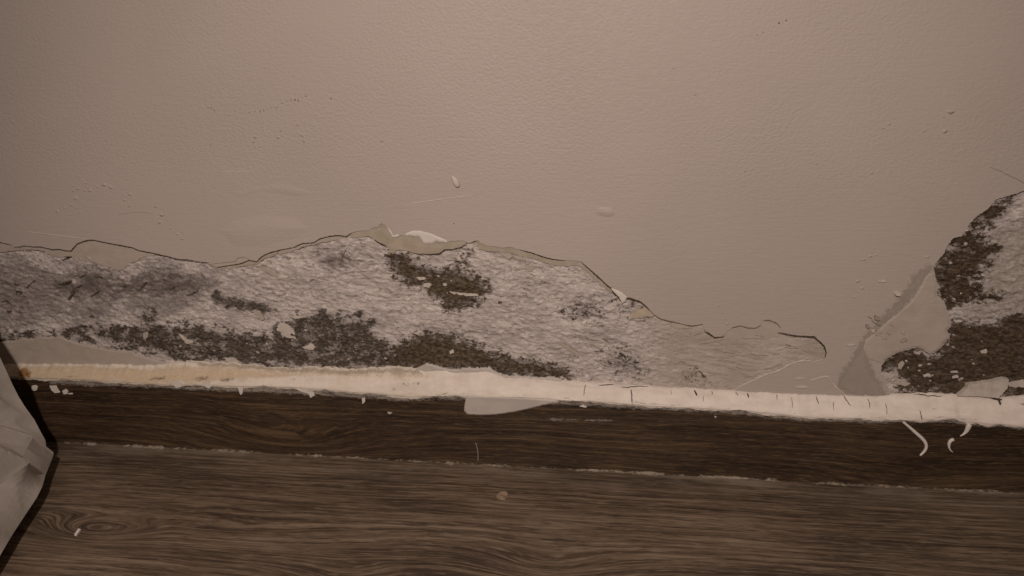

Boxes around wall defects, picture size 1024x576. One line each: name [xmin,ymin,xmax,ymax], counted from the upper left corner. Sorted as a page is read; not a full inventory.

leakage [0,289,574,383]
peeling [0,223,826,390]
mould [382,248,492,313]
crack [522,250,827,358]
peeling [839,191,1024,397]
leakage [881,194,1024,397]